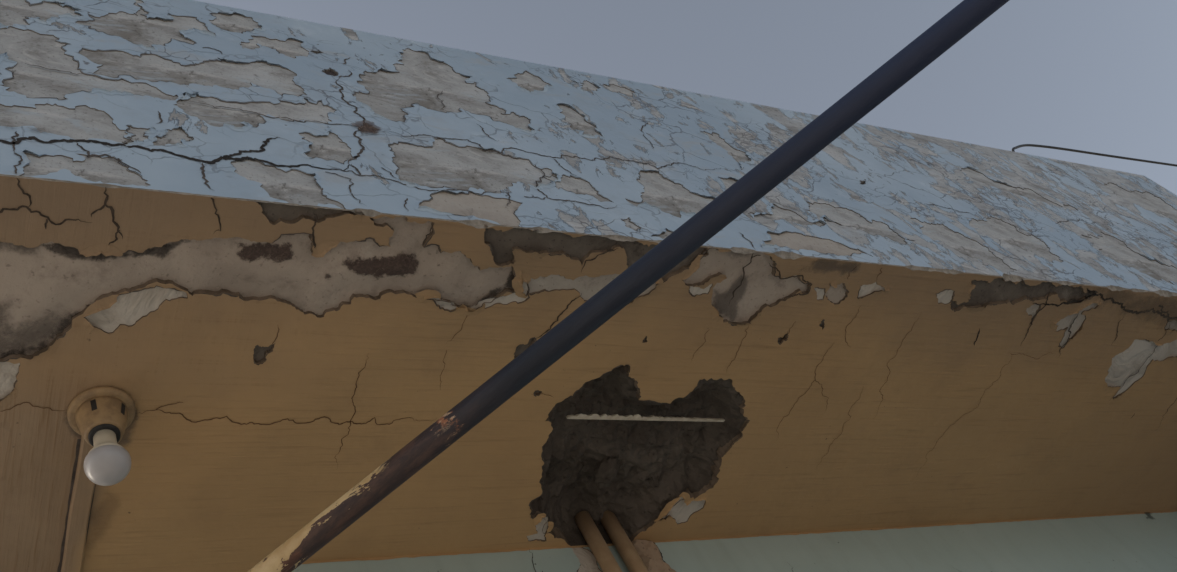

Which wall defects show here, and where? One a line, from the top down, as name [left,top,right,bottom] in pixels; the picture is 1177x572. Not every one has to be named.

crack [0,58,722,248]
leakage [47,239,182,260]
leakage [237,242,293,263]
spalling [0,0,754,408]
leakage [344,254,418,280]
leakage [488,271,515,298]
crack [535,248,618,339]
spalling [625,201,1177,349]
peeling [1103,320,1177,400]
crack [0,402,64,412]
crack [136,357,437,462]
spalling [527,365,750,572]